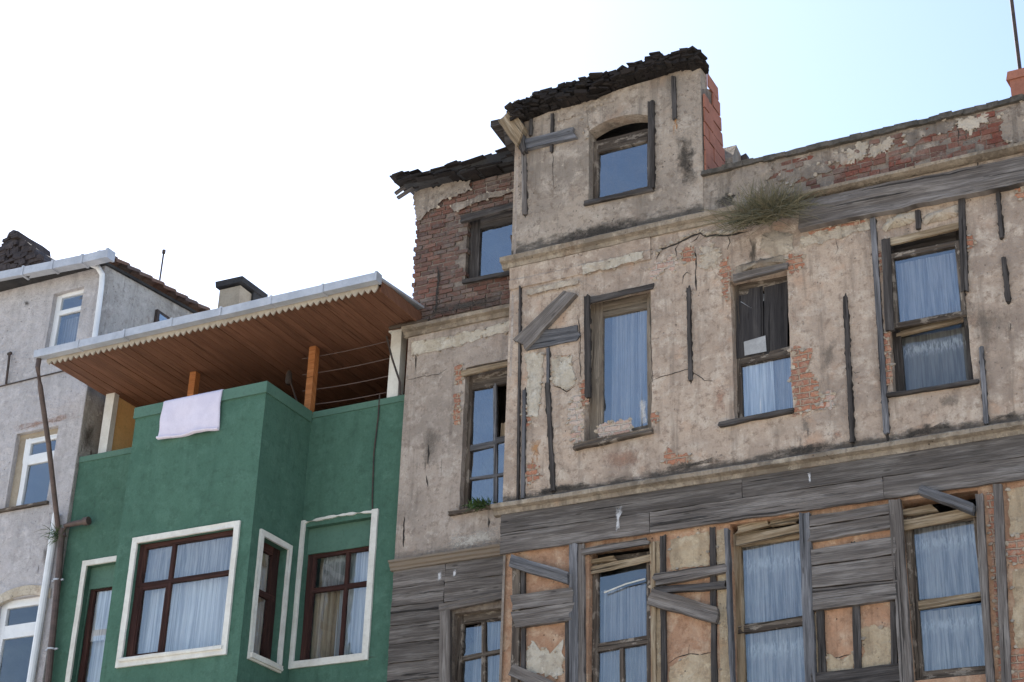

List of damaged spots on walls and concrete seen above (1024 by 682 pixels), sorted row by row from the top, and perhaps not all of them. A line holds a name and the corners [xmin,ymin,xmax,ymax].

leakage [678,141,693,175]
flaking render [728,100,1024,205]
crack [655,228,748,291]
crack [648,297,712,387]
flaking render [520,352,634,444]
flaking render [787,346,837,417]
flaking render [525,461,543,485]
flaking render [660,447,692,466]
flaking render [986,486,1024,682]
flaking render [526,640,565,680]